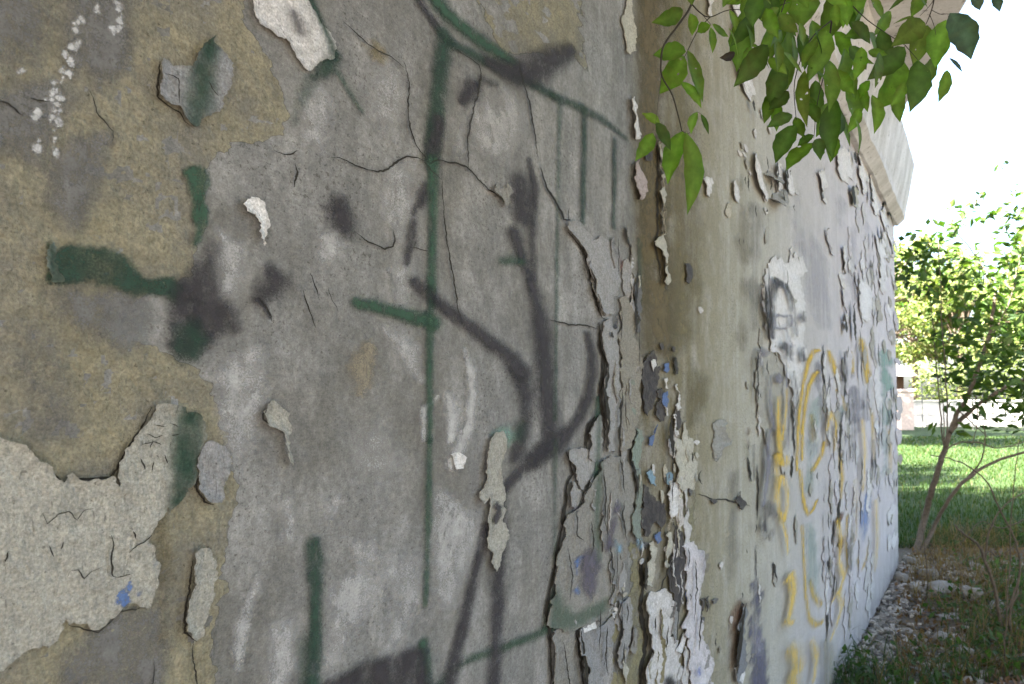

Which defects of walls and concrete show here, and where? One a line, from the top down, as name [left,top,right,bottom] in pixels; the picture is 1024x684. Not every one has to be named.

crack [276,150,299,187]
crack [332,22,501,324]
crack [519,62,570,221]
spalling [0,0,337,684]
peeling [544,220,761,684]
peeling [746,246,808,482]
peeling [809,146,903,642]